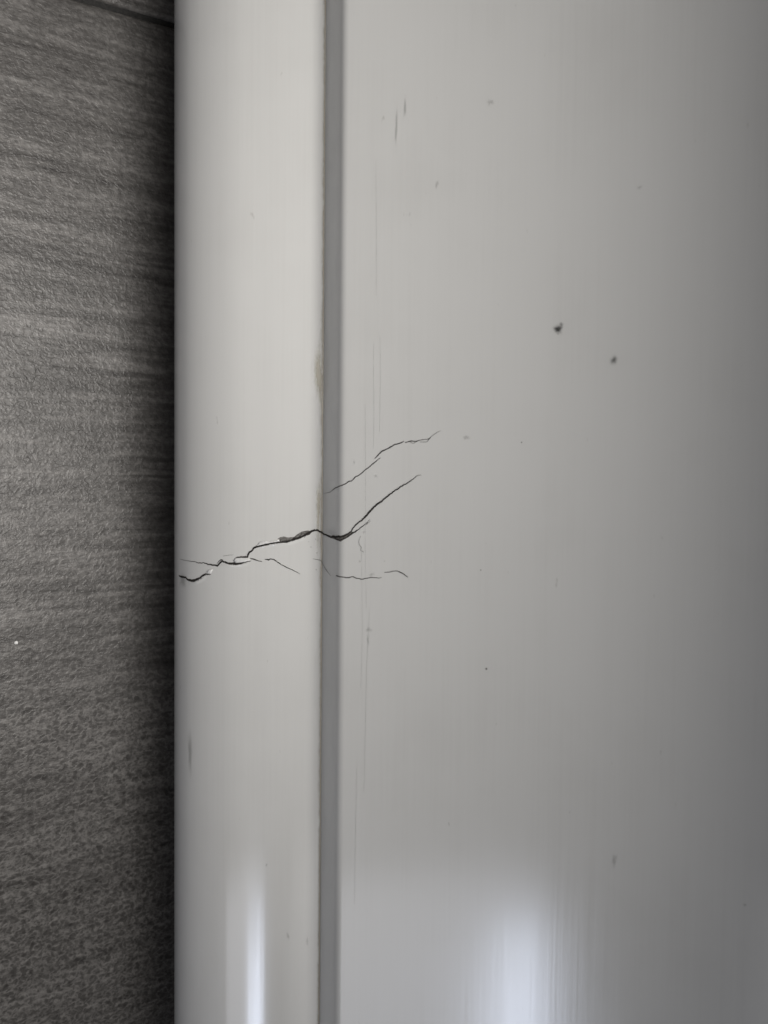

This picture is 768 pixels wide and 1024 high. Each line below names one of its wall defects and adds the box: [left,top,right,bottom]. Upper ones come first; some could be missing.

crack [328,433,436,493]
crack [179,475,420,586]